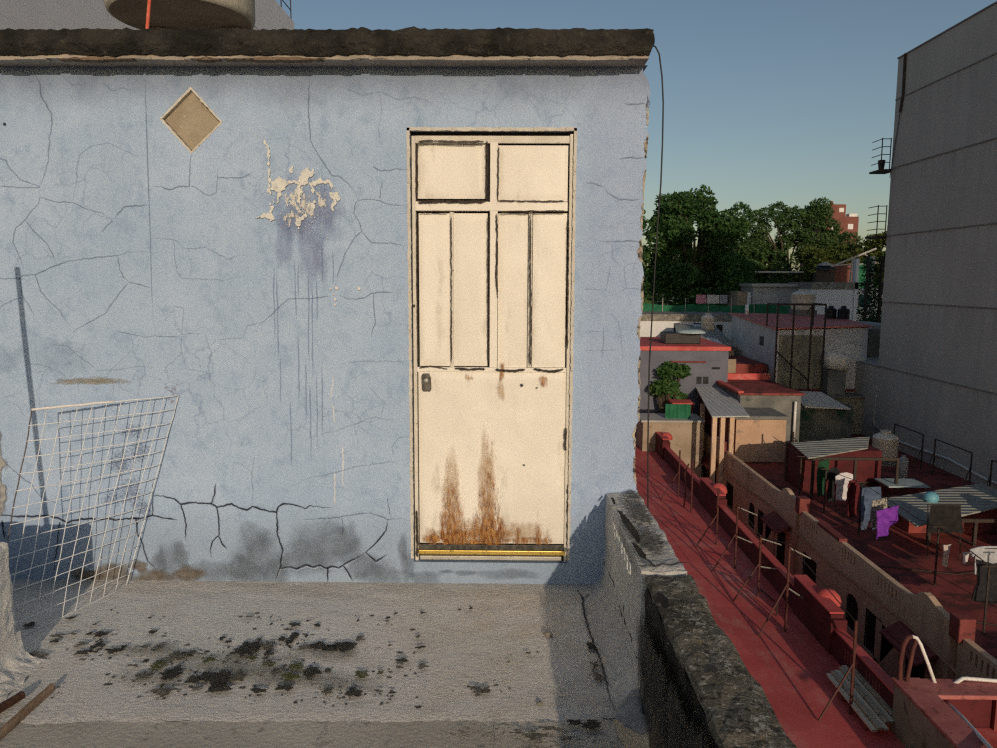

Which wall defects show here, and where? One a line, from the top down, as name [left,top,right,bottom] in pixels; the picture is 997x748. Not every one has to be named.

peeling [255,140,340,229]
crack [1,484,388,581]
rust [423,475,552,545]
crack [576,589,615,710]